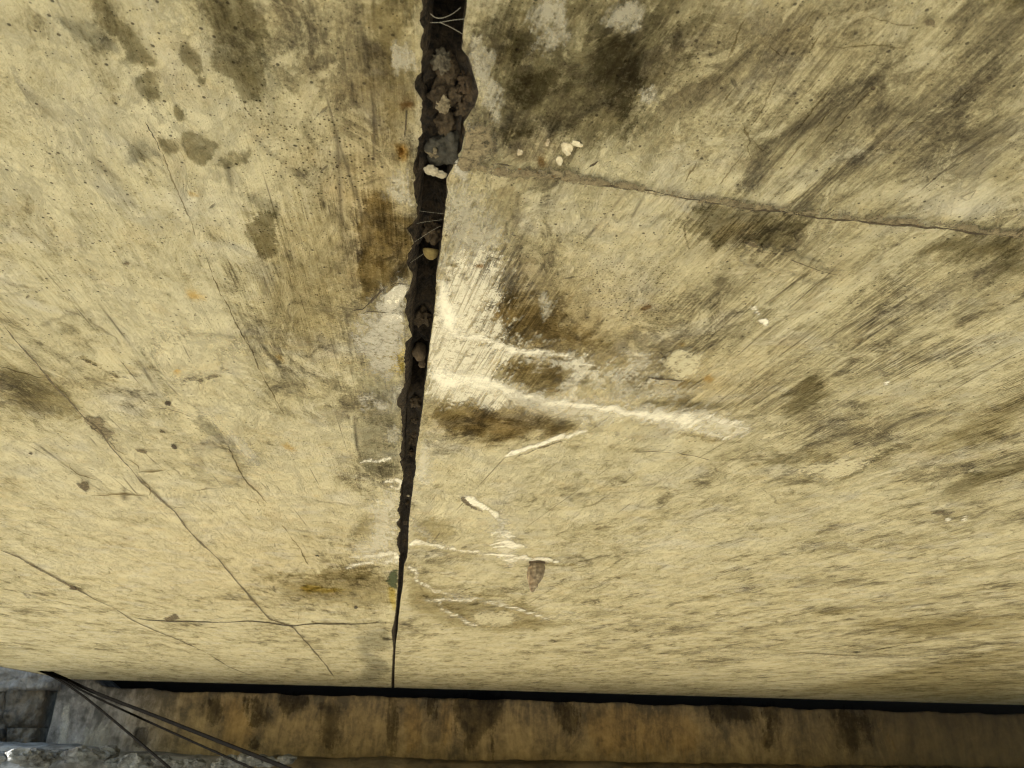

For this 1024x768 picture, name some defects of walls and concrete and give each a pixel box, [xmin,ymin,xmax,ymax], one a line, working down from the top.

crack [145,122,195,233]
crack [495,12,1021,238]
crack [206,257,284,414]
efflorescence [425,239,747,440]
crack [3,326,371,677]
efflorescence [349,551,548,627]
efflorescence [409,496,559,564]
efflorescence [506,430,631,456]